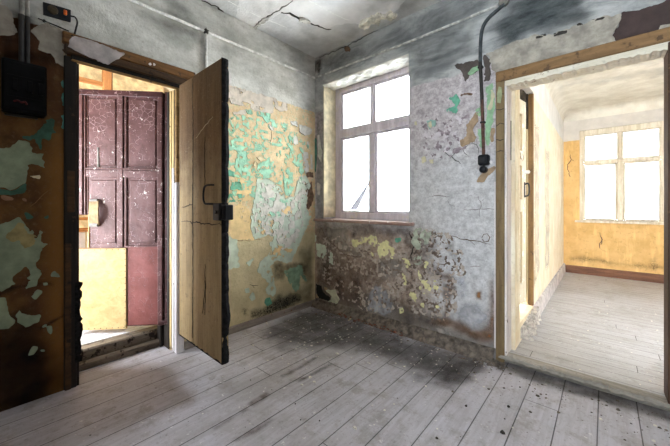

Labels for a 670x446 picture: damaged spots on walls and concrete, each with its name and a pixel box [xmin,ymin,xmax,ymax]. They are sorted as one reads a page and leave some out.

peeling [31,22,125,67]
crack [203,0,331,30]
peeling [414,0,670,164]
peeling [0,115,64,201]
peeling [228,86,322,306]
peeling [0,212,60,334]
leakage [244,293,310,317]
leakage [271,312,480,381]
peeling [315,228,466,322]